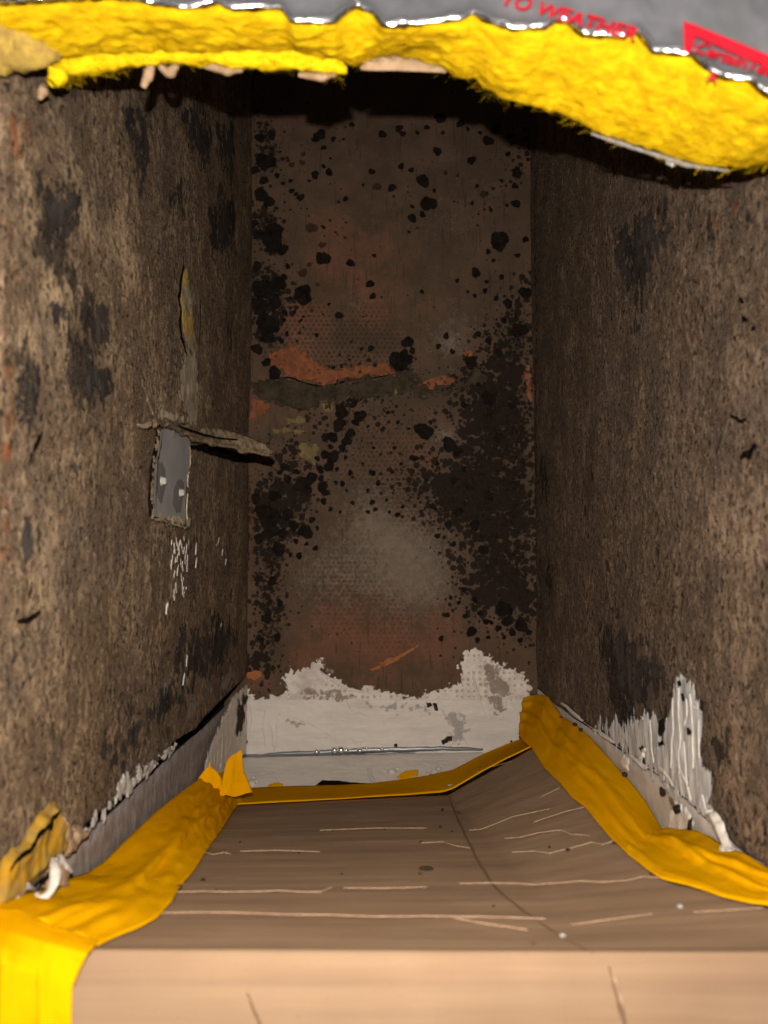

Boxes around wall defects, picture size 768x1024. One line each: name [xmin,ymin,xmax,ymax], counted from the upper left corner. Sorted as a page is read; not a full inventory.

water stain [120,106,153,164]
water stain [178,90,235,172]
mould [379,113,513,145]
mould [35,168,81,245]
mould [398,163,437,234]
mould [499,149,538,208]
mould [251,122,345,380]
mould [50,300,70,325]
crack [178,259,201,354]
water stain [251,203,544,655]
water stain [15,515,34,563]
water stain [604,609,710,819]